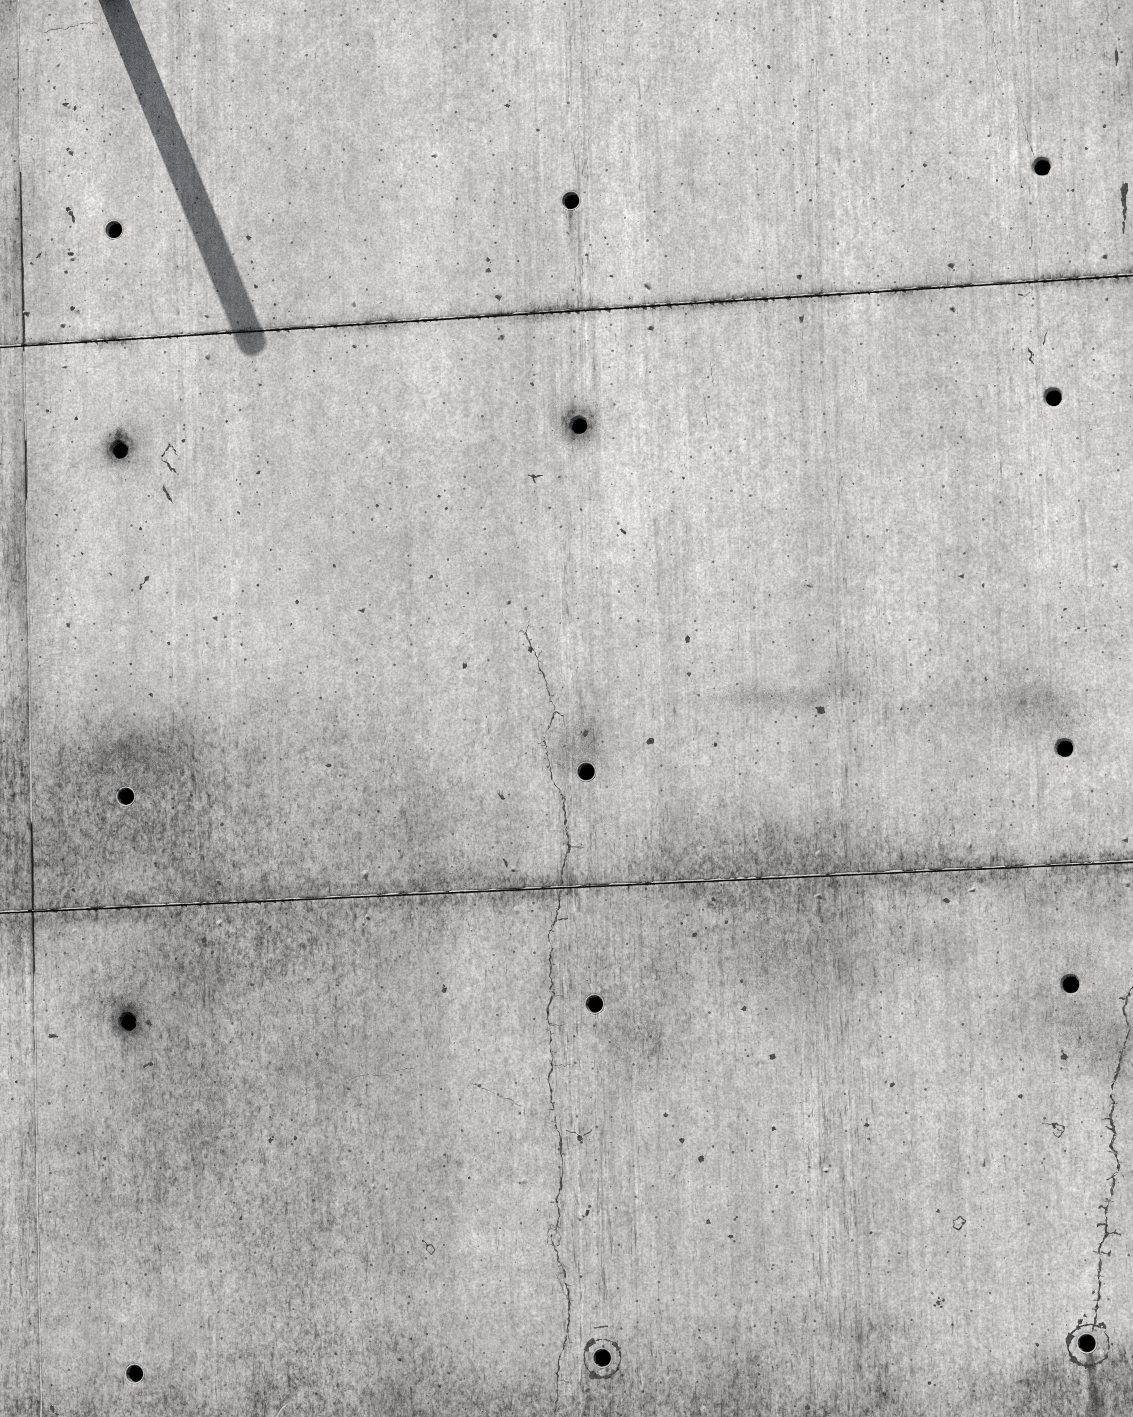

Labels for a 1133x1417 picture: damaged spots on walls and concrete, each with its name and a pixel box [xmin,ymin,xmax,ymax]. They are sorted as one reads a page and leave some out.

crack [469,621,583,1415]
crack [1092,986,1133,1331]